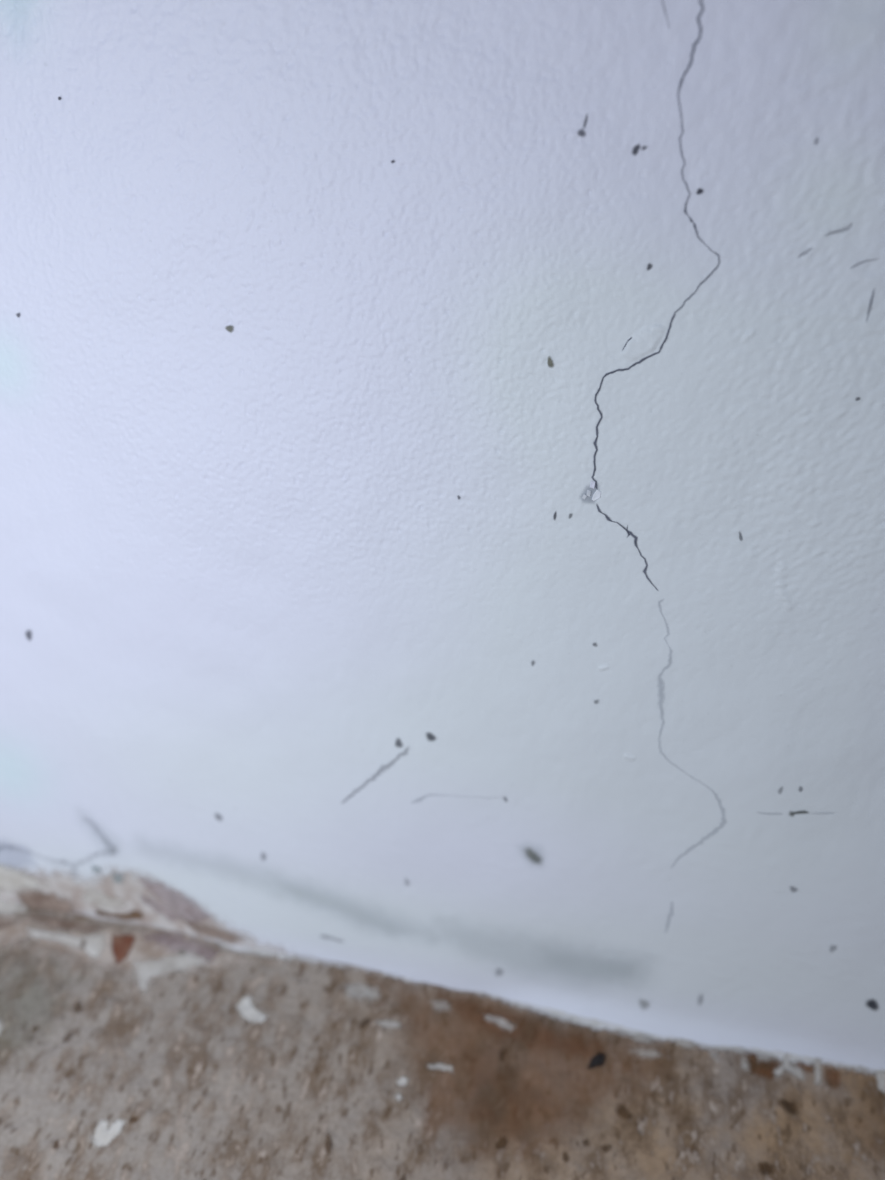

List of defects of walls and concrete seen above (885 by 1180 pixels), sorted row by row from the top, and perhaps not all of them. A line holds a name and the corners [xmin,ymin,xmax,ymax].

crack [678,0,704,92]
crack [592,202,720,590]